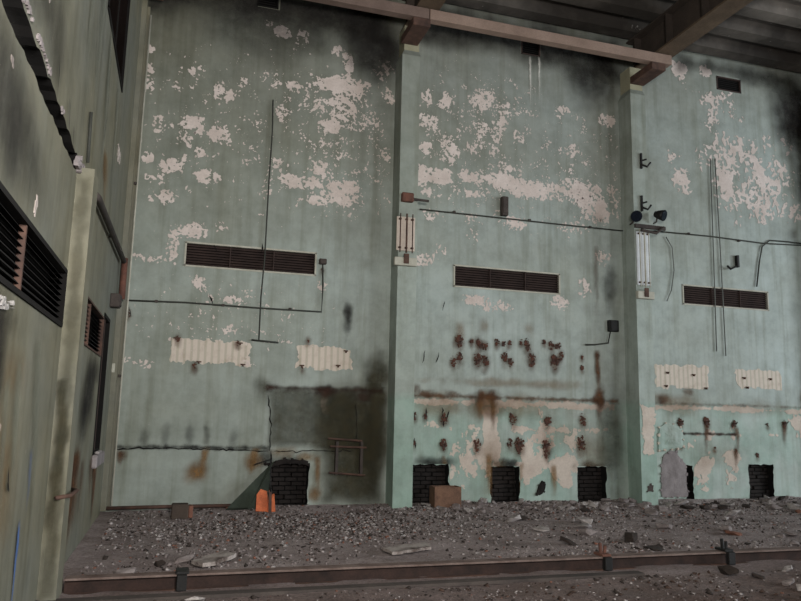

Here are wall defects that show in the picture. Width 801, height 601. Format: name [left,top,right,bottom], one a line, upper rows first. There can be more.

peeling [266,20,311,55]
peeling [141,45,395,222]
peeling [418,74,621,245]
peeling [665,149,692,195]
peeling [695,91,801,227]
peeling [133,222,228,265]
rust [450,335,536,367]
rust [542,339,564,370]
rust [549,352,617,408]
rust [414,390,535,417]
rust [507,437,525,455]
spalling [639,403,772,498]